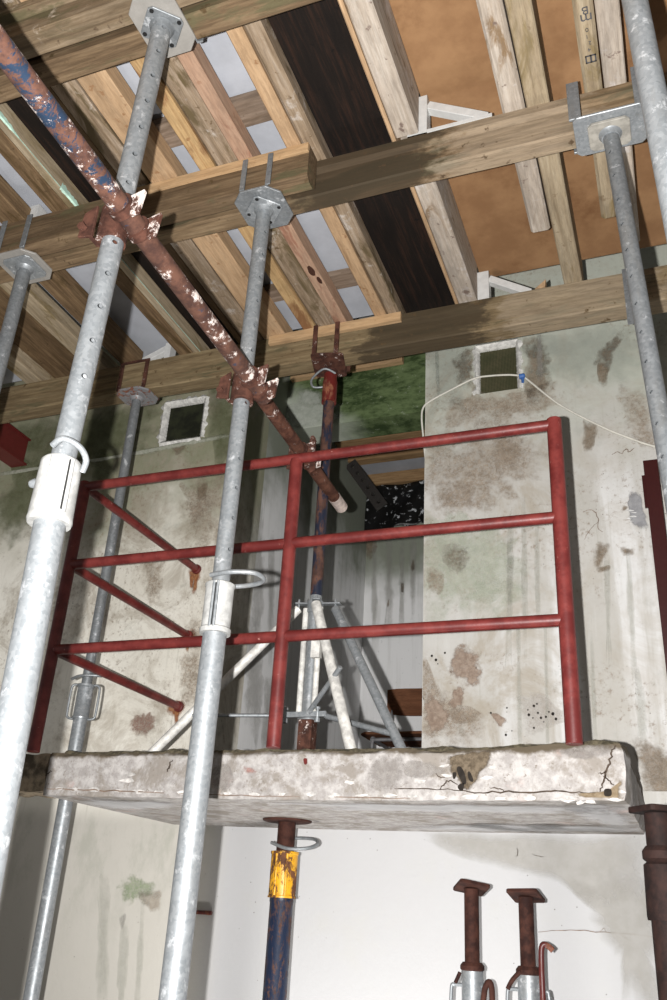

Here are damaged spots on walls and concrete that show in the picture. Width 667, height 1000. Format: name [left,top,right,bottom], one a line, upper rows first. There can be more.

water stain [597,364,608,382]
crack [46,760,183,794]
peeling [114,773,163,794]
crack [209,791,299,799]
spalling [372,751,497,799]
crack [338,745,616,799]
water stain [310,804,653,991]